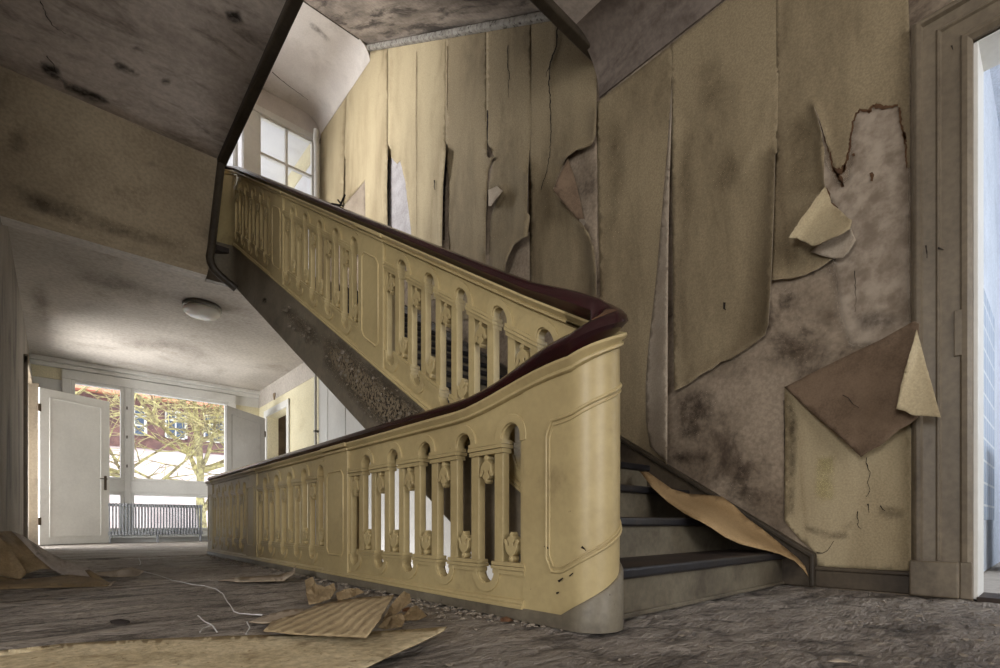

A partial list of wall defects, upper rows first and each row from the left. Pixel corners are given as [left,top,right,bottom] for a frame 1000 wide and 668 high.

flaking render [388,157,411,234]
flaking render [505,232,530,281]
flaking render [554,132,597,289]
flaking render [824,103,910,345]
crack [857,458,885,529]